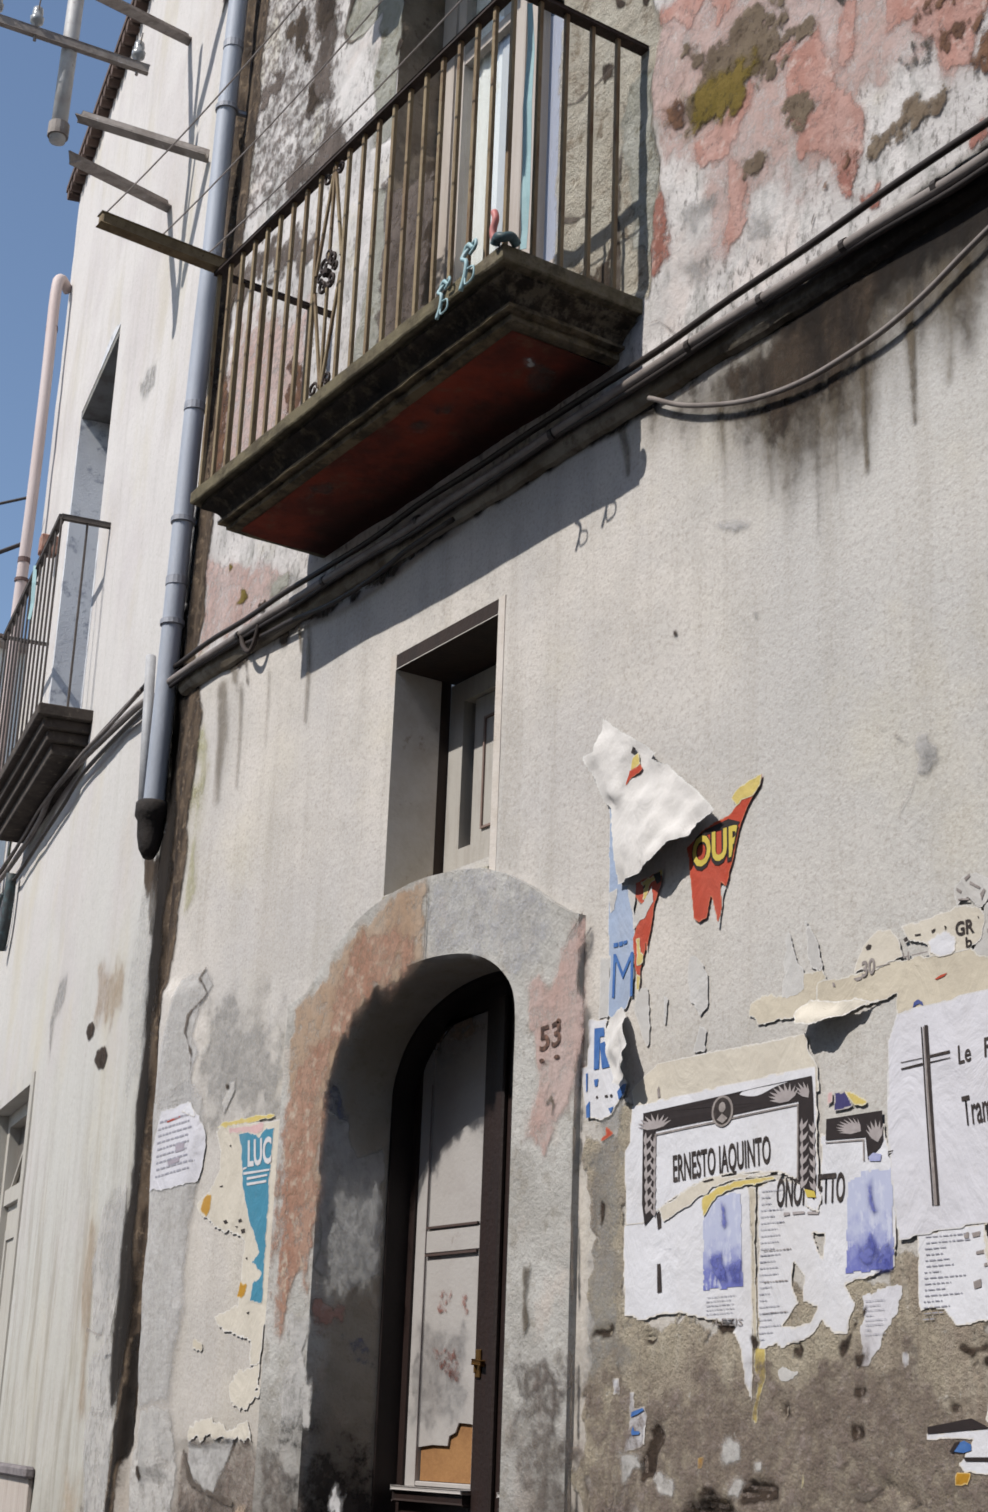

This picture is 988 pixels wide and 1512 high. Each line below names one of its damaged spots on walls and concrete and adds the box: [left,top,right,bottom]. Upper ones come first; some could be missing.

spalling [343,0,404,147]
leakage [912,141,988,197]
spalling [353,188,387,362]
leakage [677,195,988,480]
leakage [589,402,658,445]
peeling [198,559,296,655]
peeling [270,882,427,1428]
peeling [571,1102,988,1512]
peeling [177,1439,256,1512]
peeling [329,1486,340,1512]